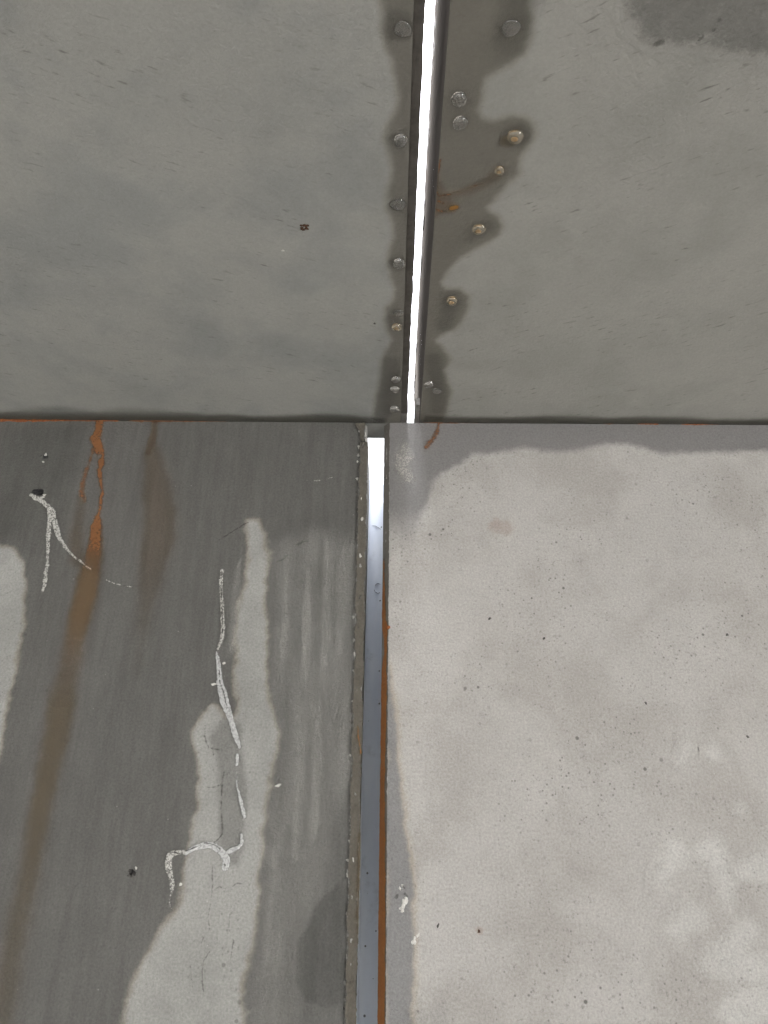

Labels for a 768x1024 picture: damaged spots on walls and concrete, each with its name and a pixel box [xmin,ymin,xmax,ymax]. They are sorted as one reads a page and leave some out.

crack [30,494,134,591]
corrosion [0,419,225,645]
leakage [0,414,384,1024]
crack [165,569,246,908]
corrosion [377,423,390,1024]
leakage [366,0,768,560]